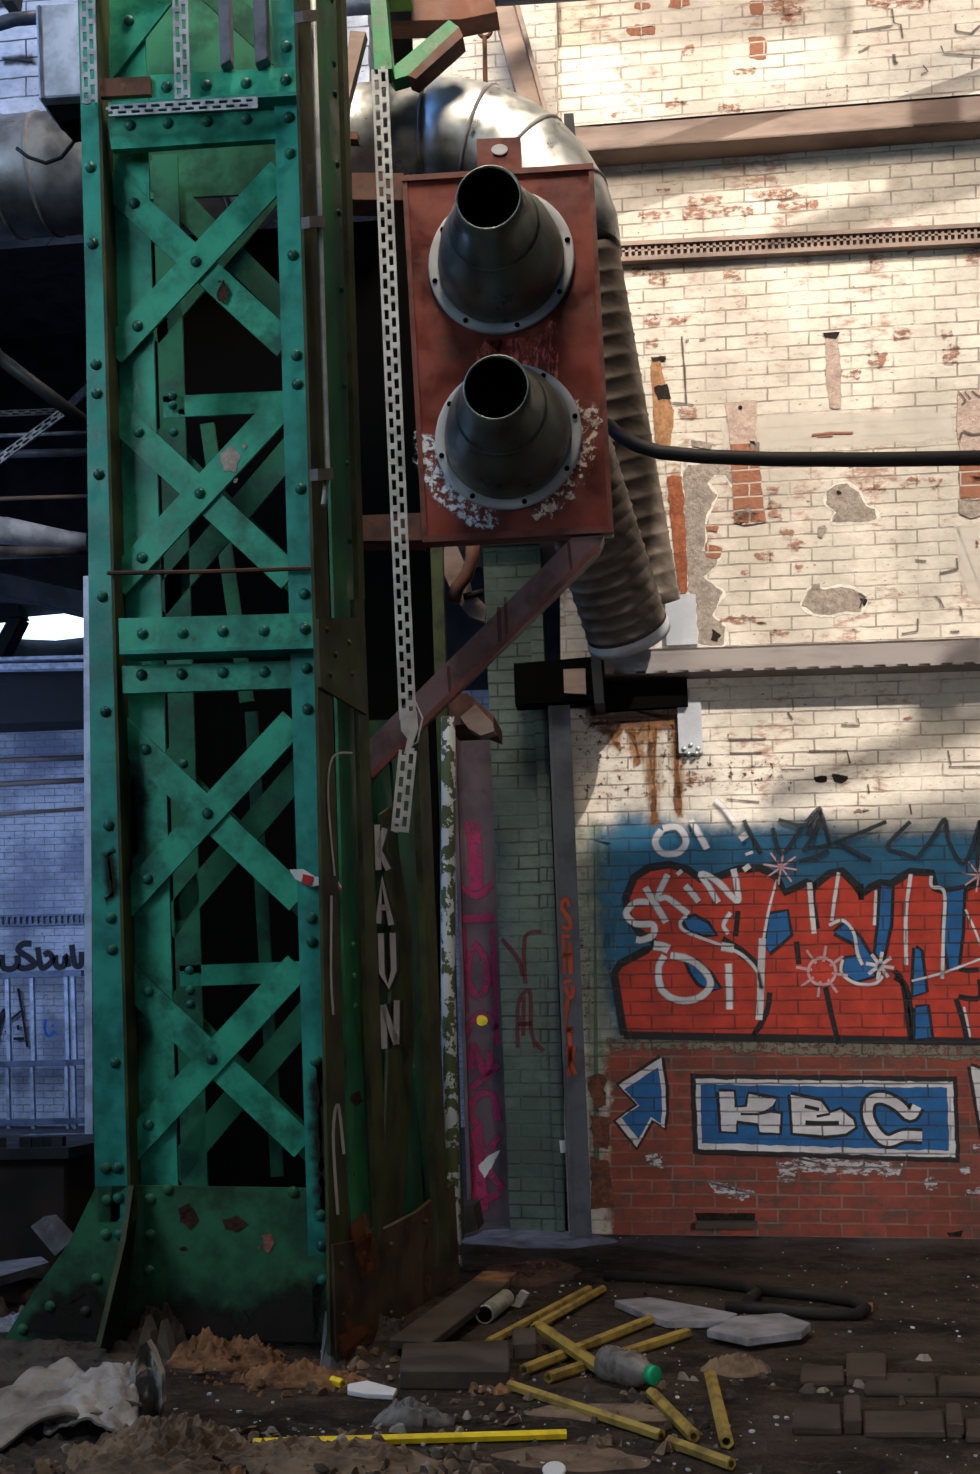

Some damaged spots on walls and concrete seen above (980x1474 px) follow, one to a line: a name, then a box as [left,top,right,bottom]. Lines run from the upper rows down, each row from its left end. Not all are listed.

peeling [476,318,559,379]
peeling [415,431,498,529]
peeling [532,399,603,520]
peeling [680,329,980,648]
rust [590,707,683,824]
rust [178,1204,199,1251]
rust [222,1216,248,1232]